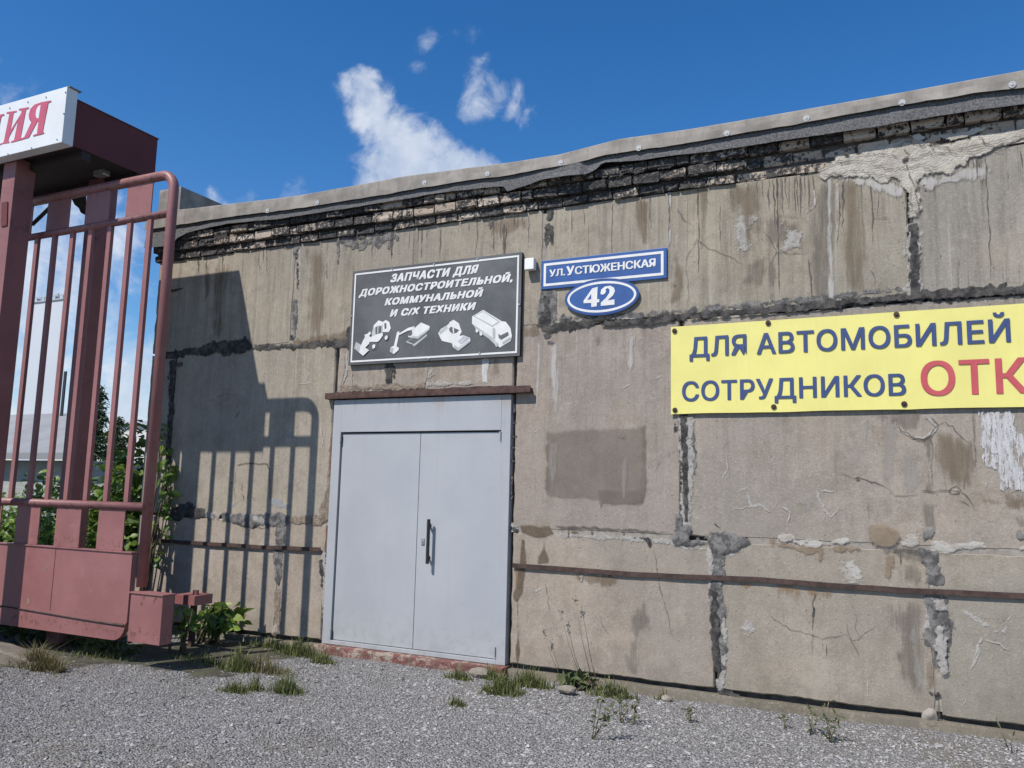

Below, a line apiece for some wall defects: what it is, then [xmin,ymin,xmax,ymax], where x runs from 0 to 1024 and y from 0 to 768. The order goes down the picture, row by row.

flaking render [819,124,1024,217]
damp [521,155,1024,410]
crack [896,413,970,443]
peeling [978,409,1024,493]
crack [921,486,975,510]
crack [812,593,827,656]
spalling [716,679,740,697]